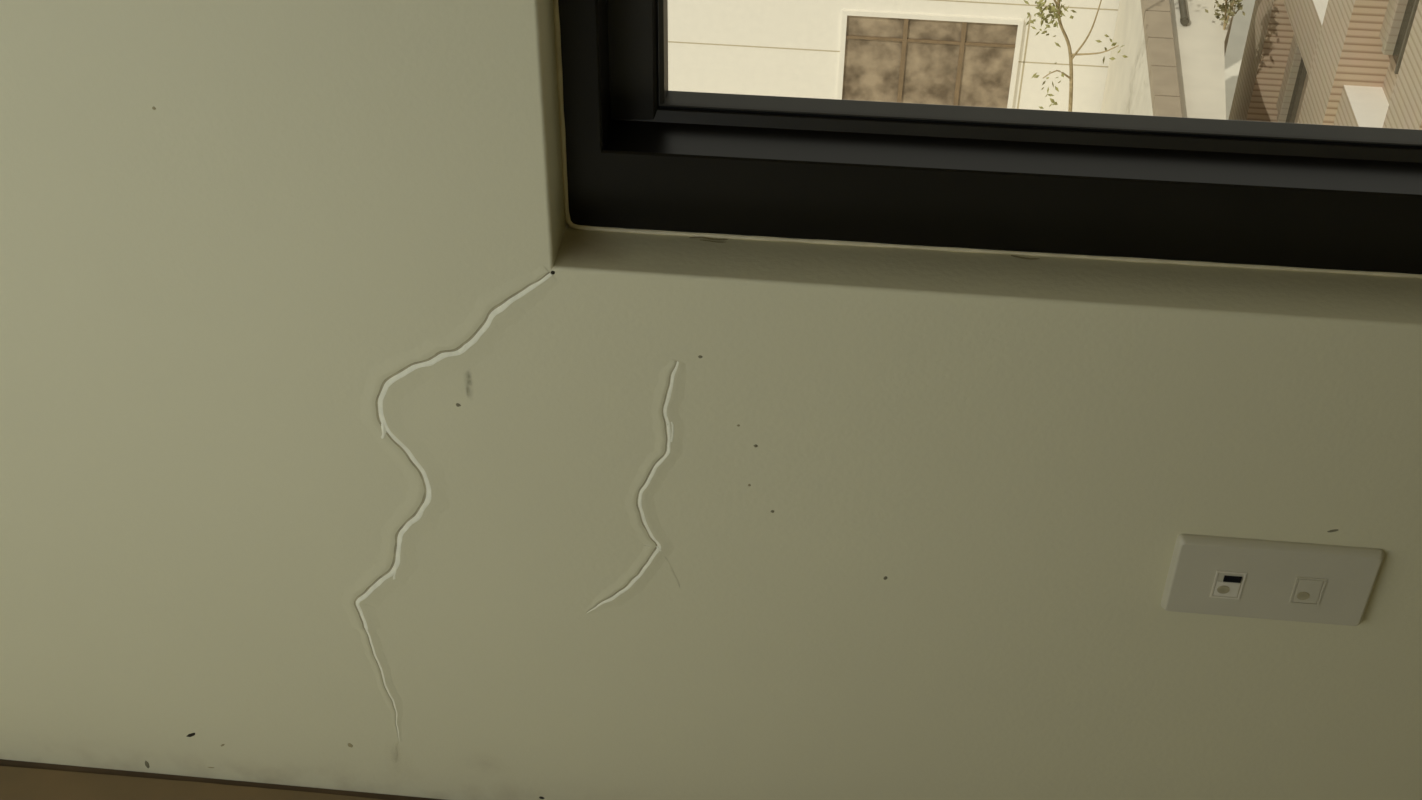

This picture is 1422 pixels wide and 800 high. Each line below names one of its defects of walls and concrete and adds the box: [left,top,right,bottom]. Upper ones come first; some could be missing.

crack [342,265,560,763]
crack [585,359,686,615]